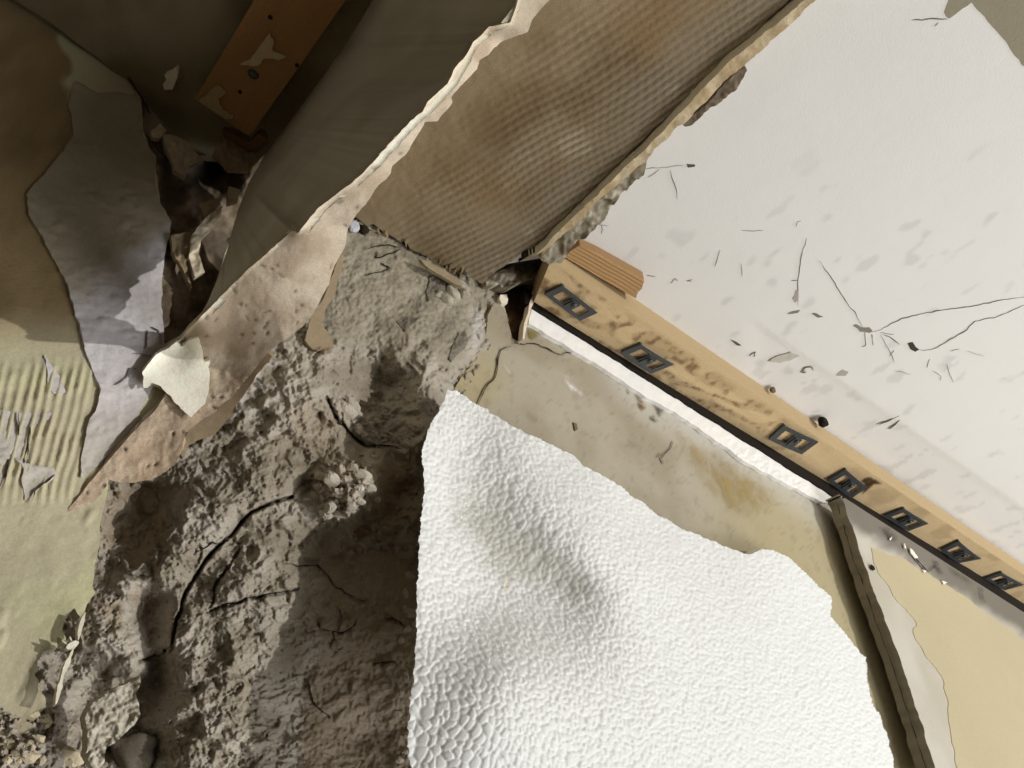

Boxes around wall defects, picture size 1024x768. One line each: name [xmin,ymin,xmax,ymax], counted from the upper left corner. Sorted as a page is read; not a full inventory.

spalling [0,0,549,768]
crack [478,343,570,404]
crack [791,221,1024,381]
crack [139,496,363,662]
peeling [870,548,1024,768]